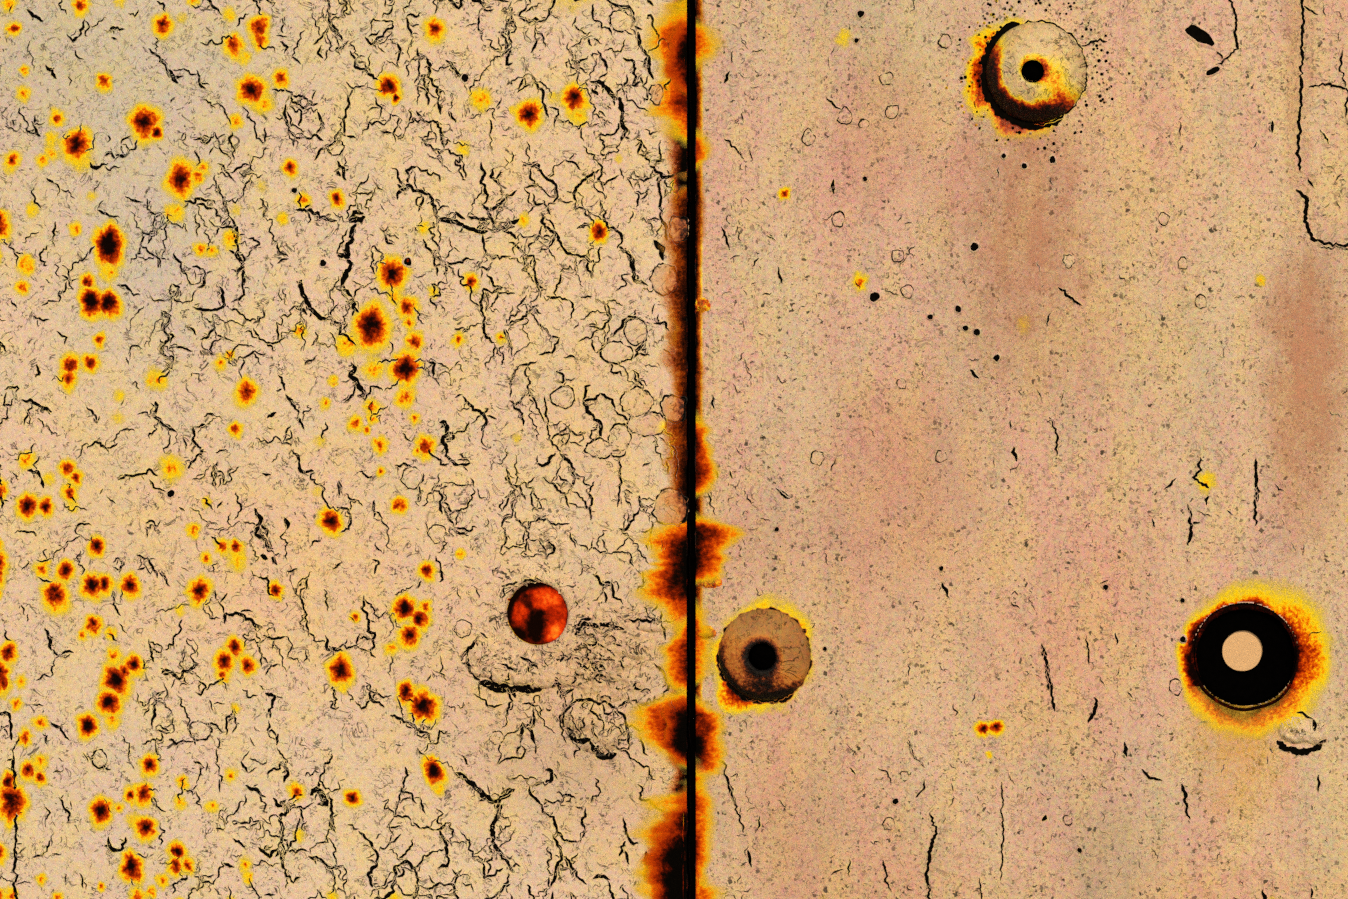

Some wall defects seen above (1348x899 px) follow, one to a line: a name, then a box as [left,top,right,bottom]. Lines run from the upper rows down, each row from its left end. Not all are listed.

corrosion [962,18,1053,140]
corrosion [58,219,128,394]
crack [0,0,682,899]
corrosion [336,254,438,477]
corrosion [630,0,814,899]
crack [706,0,1225,899]
crack [1085,429,1305,590]
crack [1183,346,1269,389]
corrosion [507,582,568,645]
corrosion [1175,580,1332,754]
crack [1266,711,1343,792]
crack [1117,846,1318,899]